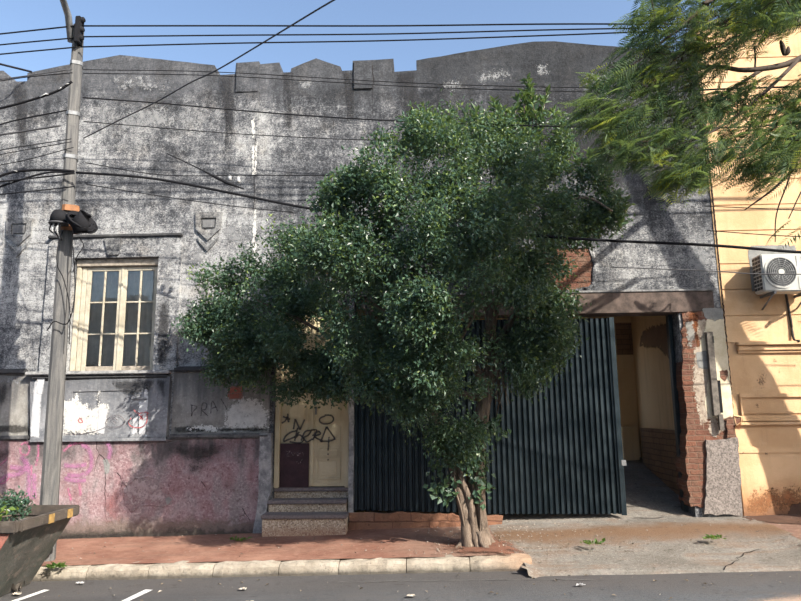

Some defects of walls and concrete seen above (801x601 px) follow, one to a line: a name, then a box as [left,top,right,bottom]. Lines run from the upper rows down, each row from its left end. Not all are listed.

water stain [158,304,168,361]
flaking render [615,323,669,358]
peeling [692,319,742,438]
water stain [0,378,45,438]
peeling [63,390,109,436]
peeling [187,386,270,432]
crack [94,442,127,516]
water stain [788,503,801,514]